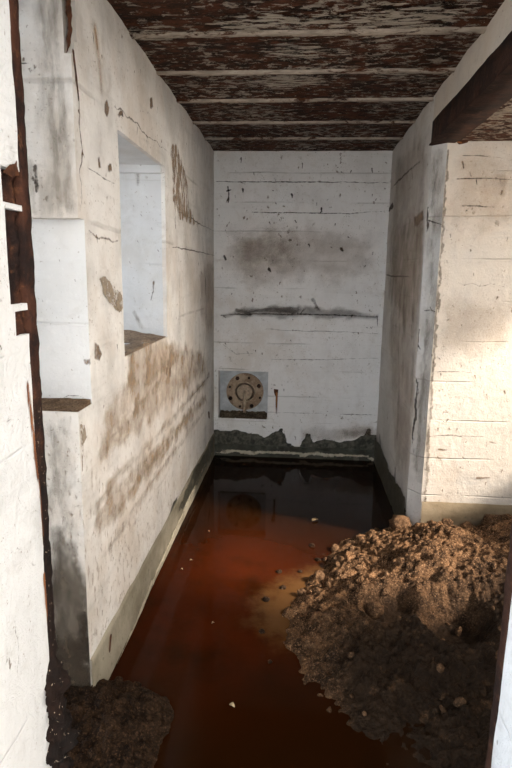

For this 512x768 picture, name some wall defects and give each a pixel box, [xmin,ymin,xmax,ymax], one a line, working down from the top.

peeling [207,0,481,33]
peeling [242,75,341,92]
peeling [260,43,347,61]
peeling [172,143,195,227]
peeling [100,276,123,312]
damp [129,343,204,423]
crack [412,379,484,443]
damp [120,428,405,657]
damp [52,533,91,688]